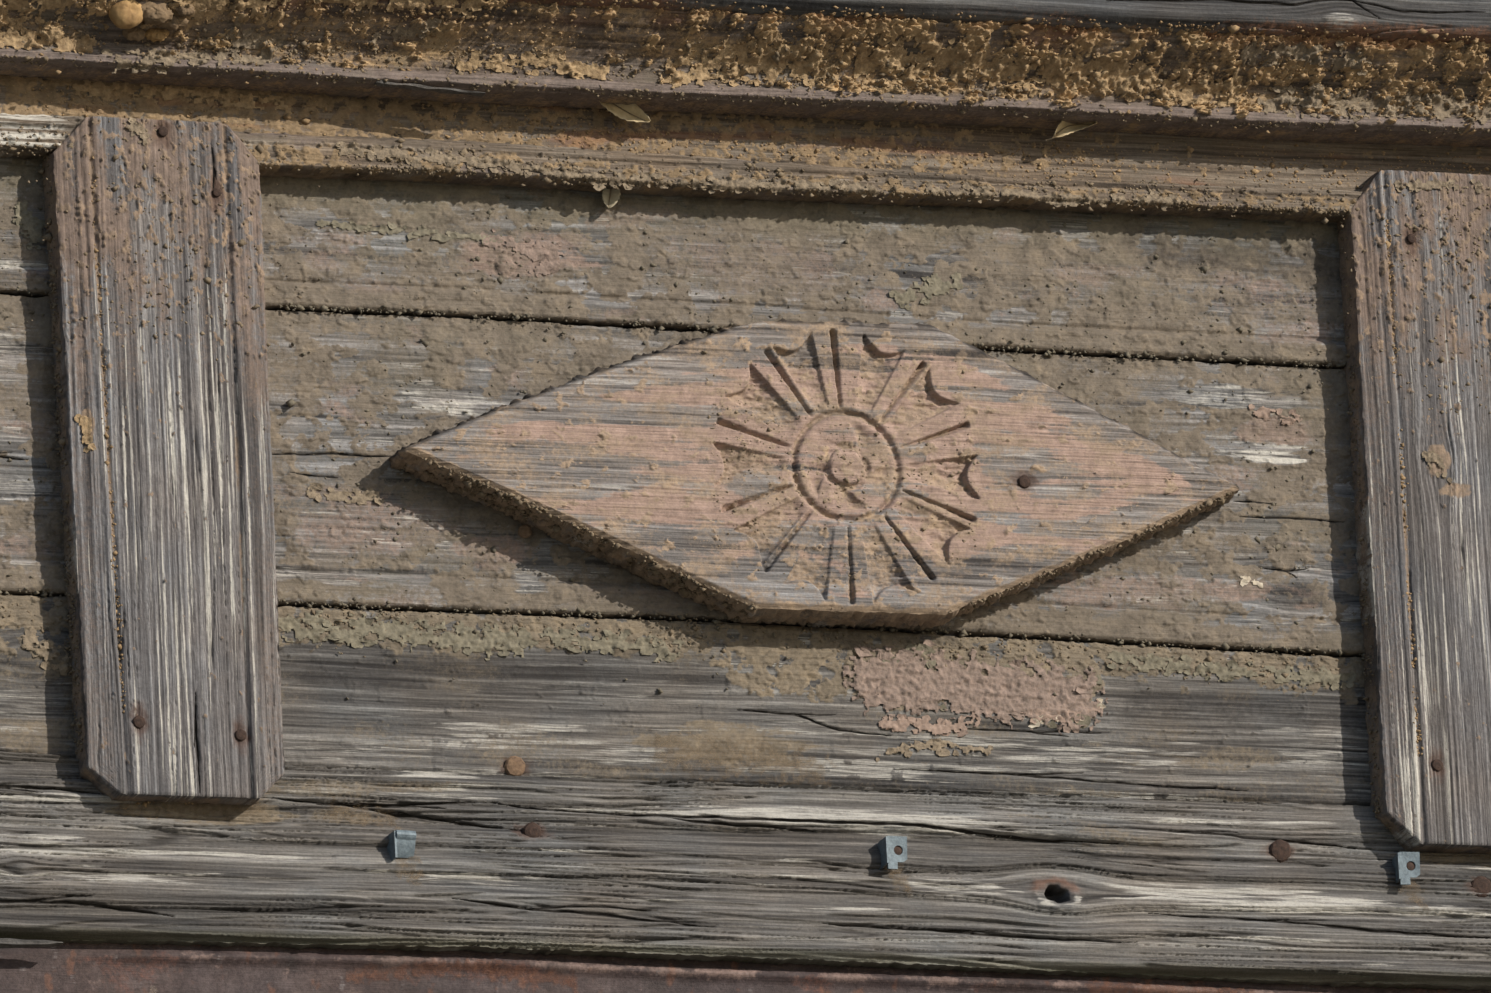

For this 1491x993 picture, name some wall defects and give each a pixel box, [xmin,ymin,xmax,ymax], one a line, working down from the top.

peeling [313,0,482,19]
peeling [454,48,610,80]
peeling [660,31,1491,124]
peeling [843,640,1357,762]